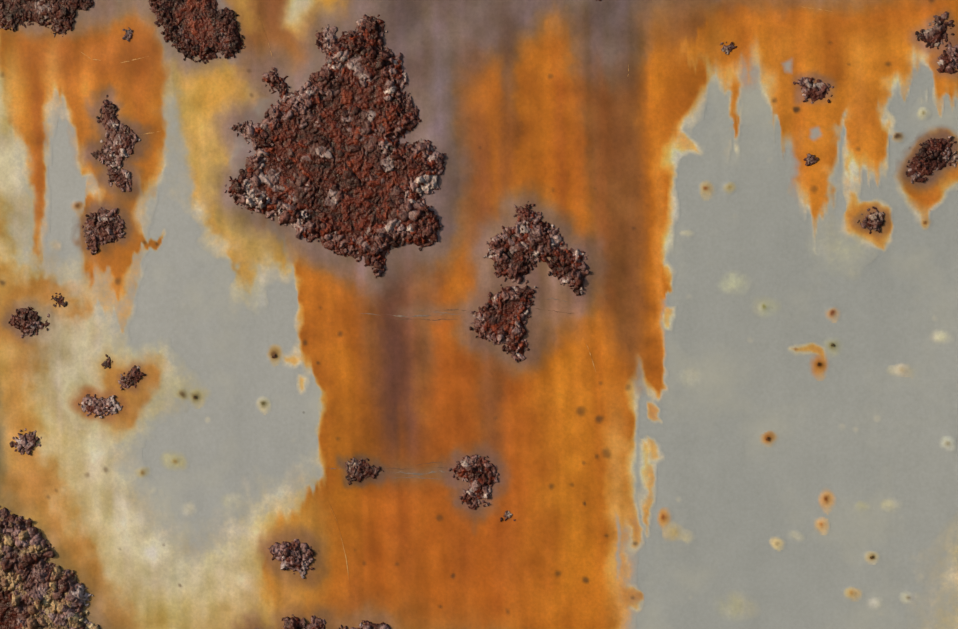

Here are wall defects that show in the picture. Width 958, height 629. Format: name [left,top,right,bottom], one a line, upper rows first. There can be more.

rust [681,0,958,282]
rust [0,0,722,629]
rust [898,508,958,629]